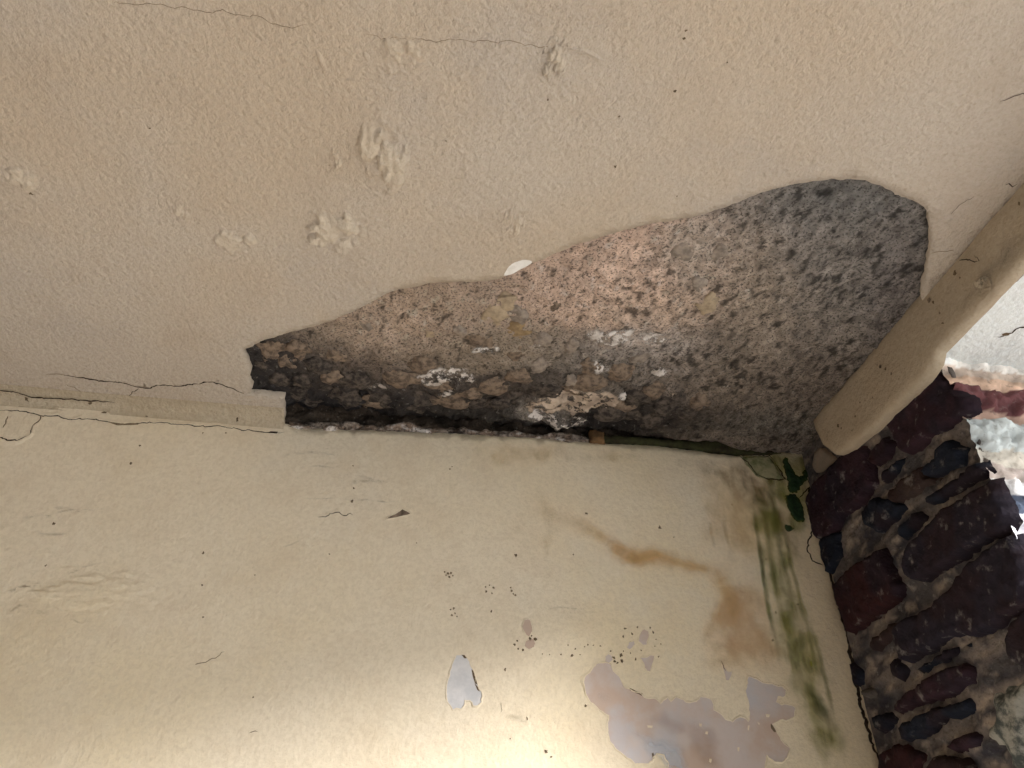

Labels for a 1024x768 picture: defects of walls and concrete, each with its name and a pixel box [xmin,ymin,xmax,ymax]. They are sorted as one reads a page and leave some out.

crack [114,1,307,28]
crack [367,34,553,48]
spalling [246,179,929,479]
crack [0,373,284,446]
peeling [444,653,484,711]
peeling [513,618,797,768]